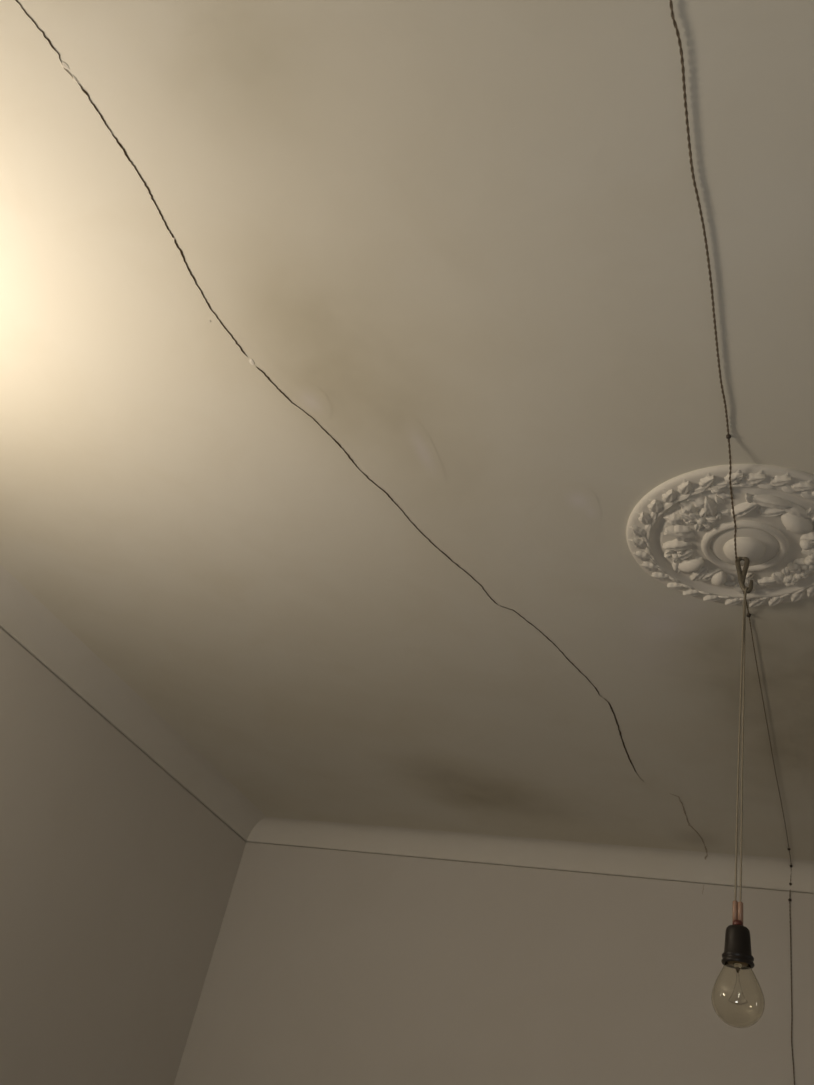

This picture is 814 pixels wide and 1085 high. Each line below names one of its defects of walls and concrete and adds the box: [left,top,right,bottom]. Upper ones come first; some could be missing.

crack [15,0,644,782]